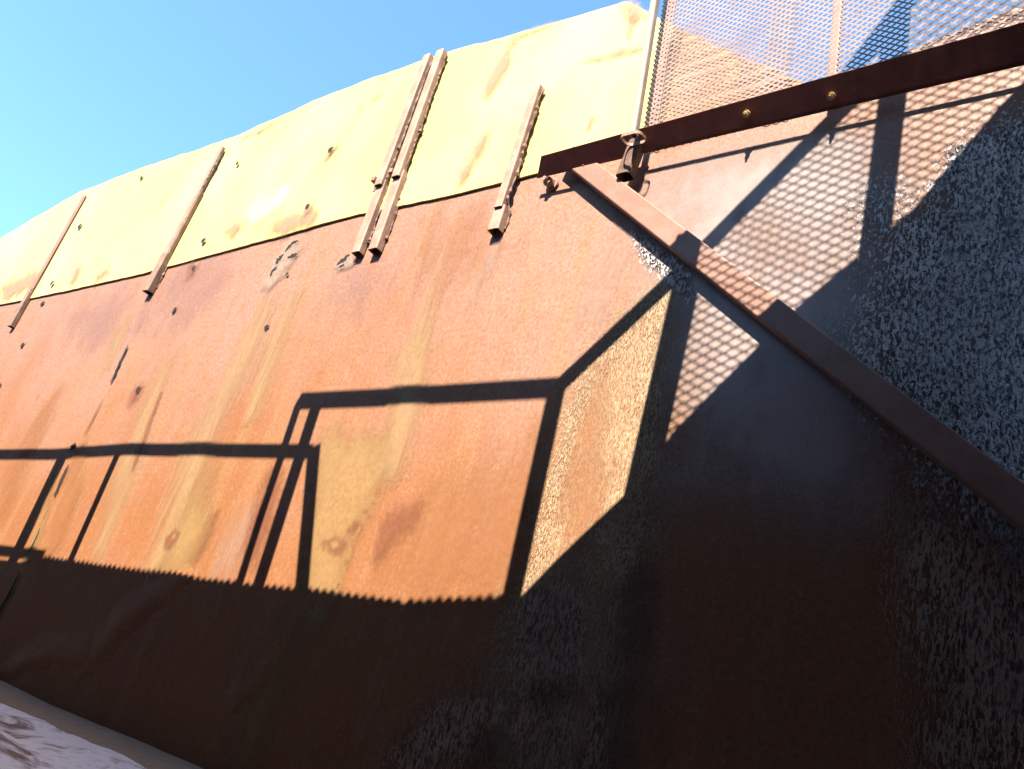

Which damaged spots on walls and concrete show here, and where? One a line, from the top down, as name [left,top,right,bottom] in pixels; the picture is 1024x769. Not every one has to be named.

corrosion [484,25,544,94]
spalling [270,240,298,276]
corrosion [94,363,166,553]
corrosion [250,478,279,556]
corrosion [295,431,390,634]